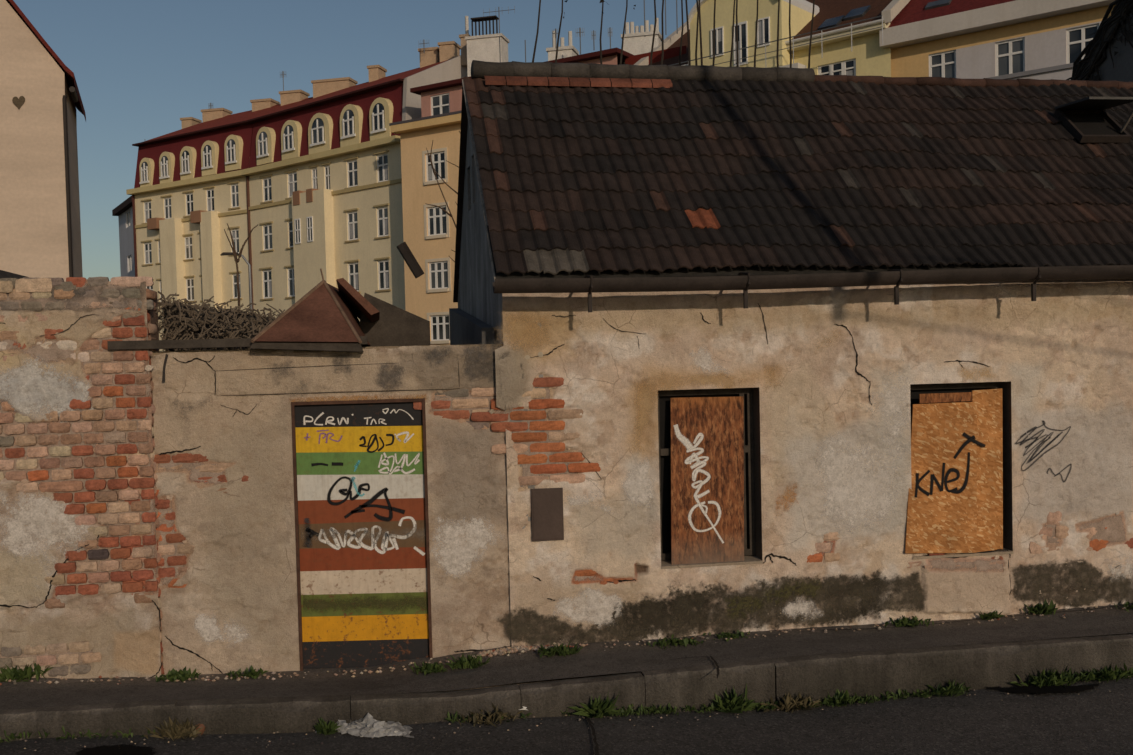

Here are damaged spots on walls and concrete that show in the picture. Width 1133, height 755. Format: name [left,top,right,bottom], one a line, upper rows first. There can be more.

flaking render [0,276,232,609]
flaking render [413,376,601,492]
crack [0,535,99,608]
crack [152,600,223,677]
water stain [498,571,926,646]
water stain [1012,560,1133,608]